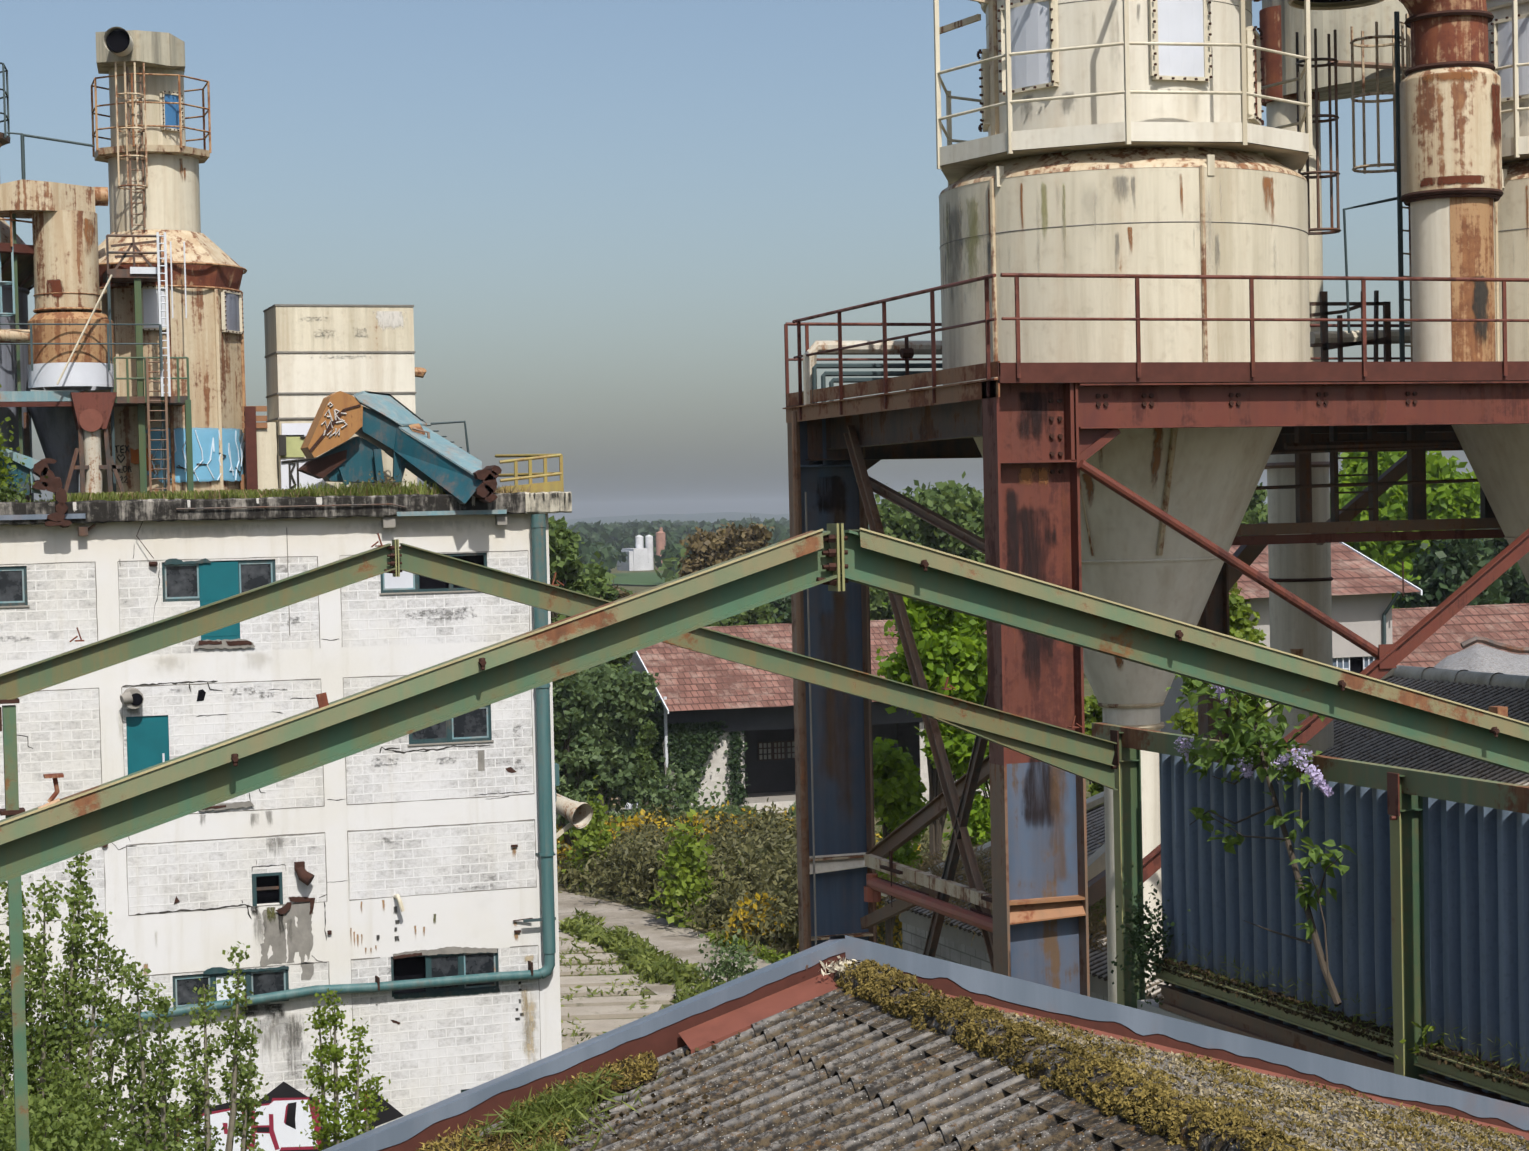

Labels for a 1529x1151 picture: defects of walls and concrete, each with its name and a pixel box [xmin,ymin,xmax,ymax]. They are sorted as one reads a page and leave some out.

rust [1423,71,1476,81]
rust [1491,83,1501,146]
rust [1263,177,1274,212]
rust [83,218,94,252]
rust [46,279,64,298]
rust [1420,175,1496,362]
rust [1020,392,1052,437]
rust [1007,490,1056,582]
rust [1021,630,1054,681]
rust [1024,758,1059,824]
spalling [260,896,315,980]